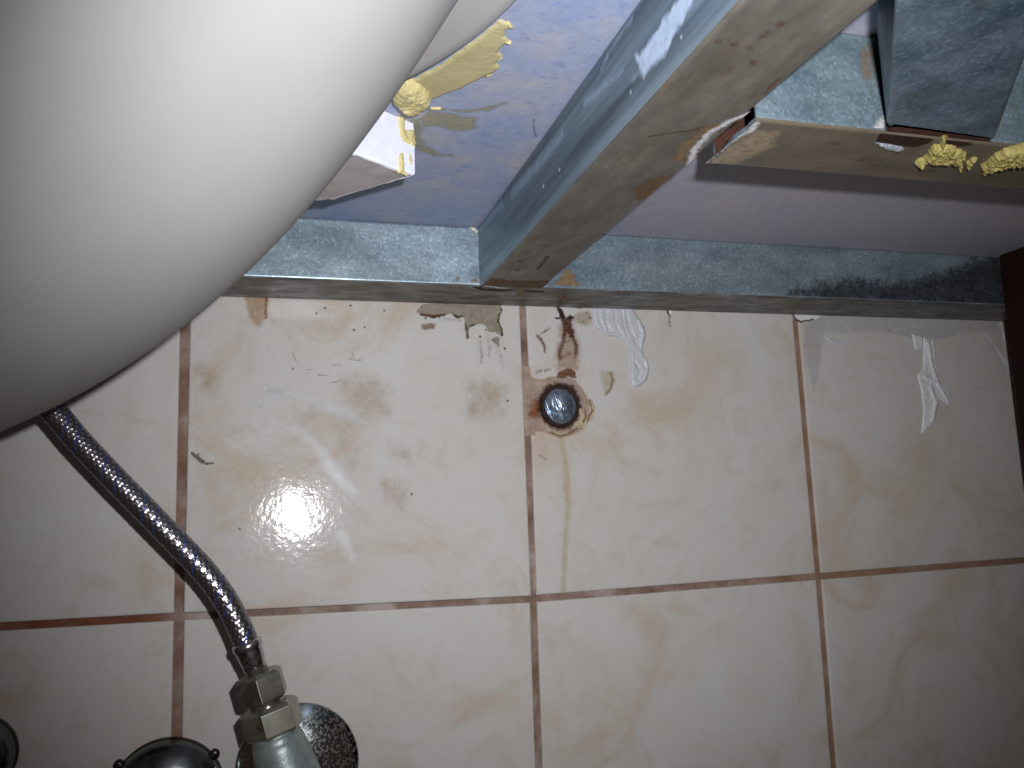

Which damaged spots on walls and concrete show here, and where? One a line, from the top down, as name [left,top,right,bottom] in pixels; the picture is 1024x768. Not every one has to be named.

damp [984,321,1016,396]